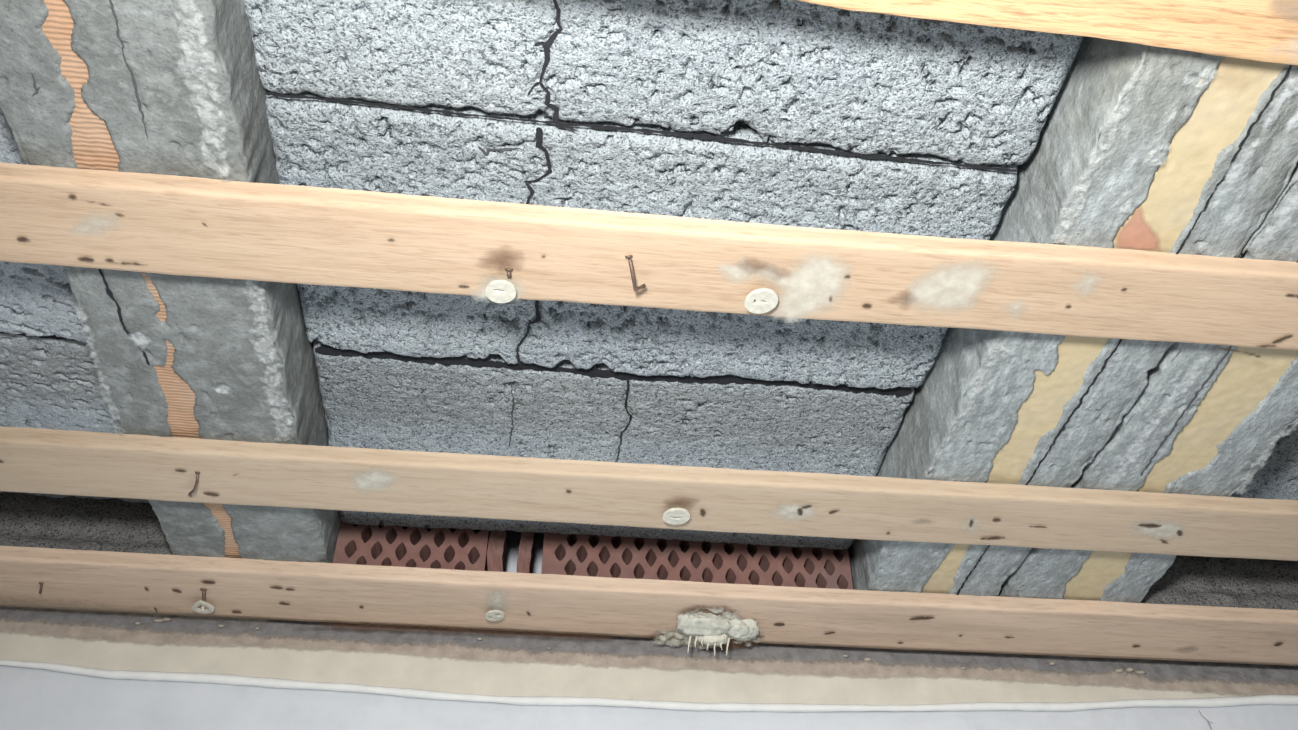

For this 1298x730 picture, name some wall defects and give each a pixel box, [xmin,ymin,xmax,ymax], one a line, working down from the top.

crack [109,0,148,138]
crack [478,0,580,204]
crack [98,269,150,365]
crack [509,300,548,447]
crack [615,373,634,462]